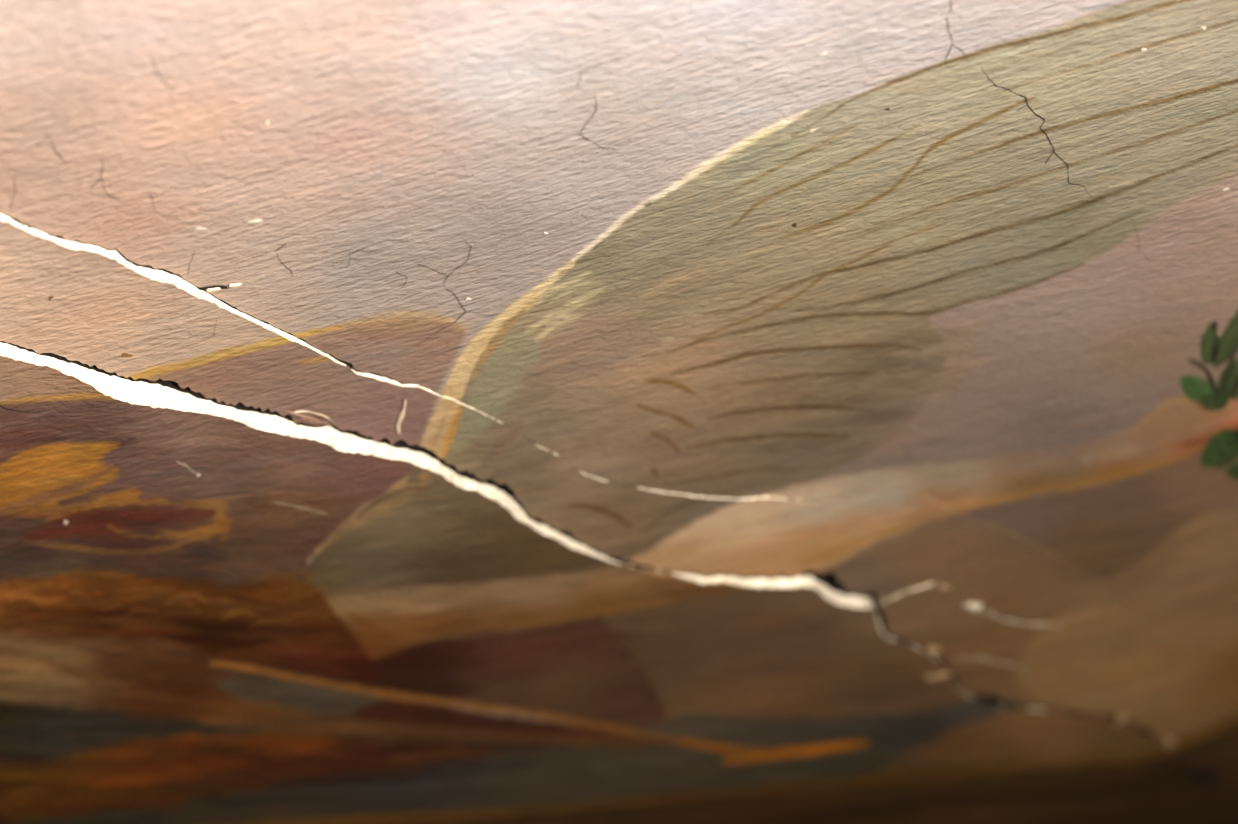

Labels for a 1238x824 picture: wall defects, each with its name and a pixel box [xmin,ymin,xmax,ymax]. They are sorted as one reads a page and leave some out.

crack [991,81,1083,186]
crack [0,202,1176,750]